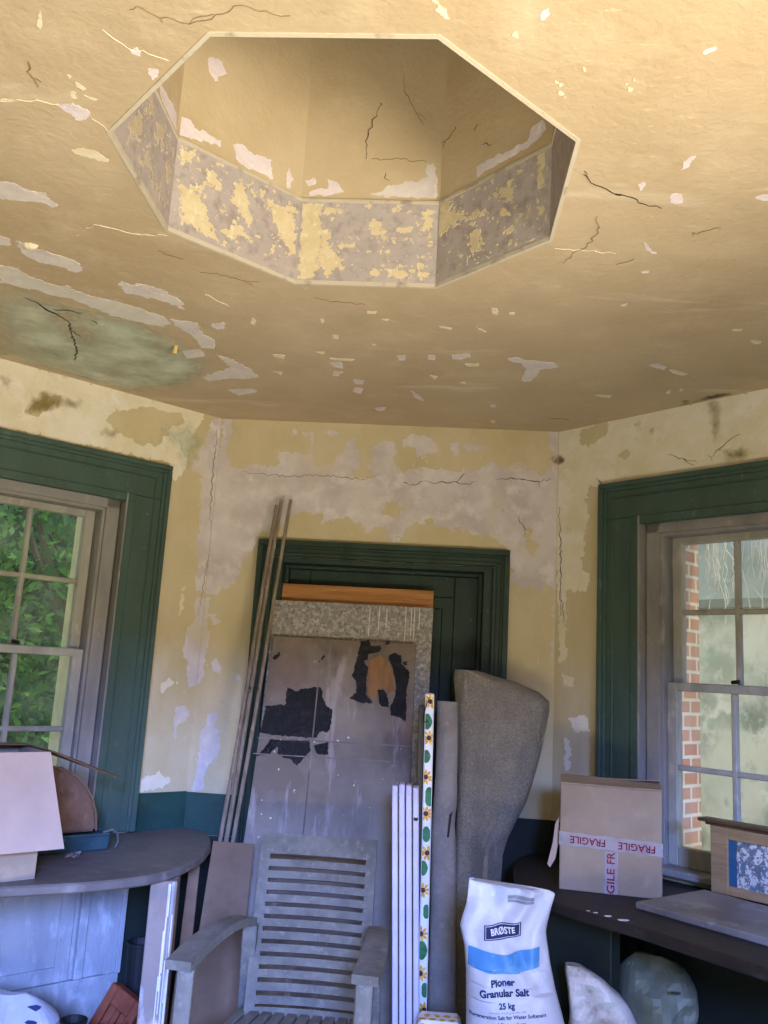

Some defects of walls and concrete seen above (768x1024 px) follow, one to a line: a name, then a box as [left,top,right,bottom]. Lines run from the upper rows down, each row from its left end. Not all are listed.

crack [130,5,287,25]
crack [365,103,492,180]
peeling [0,181,58,208]
peeling [124,68,548,281]
crack [584,171,660,208]
crack [555,218,632,265]
crack [26,298,97,360]
leakage [2,301,195,388]
peeling [0,265,259,395]
leakage [33,394,71,410]
flaking render [0,357,768,694]
flaking render [139,771,171,792]